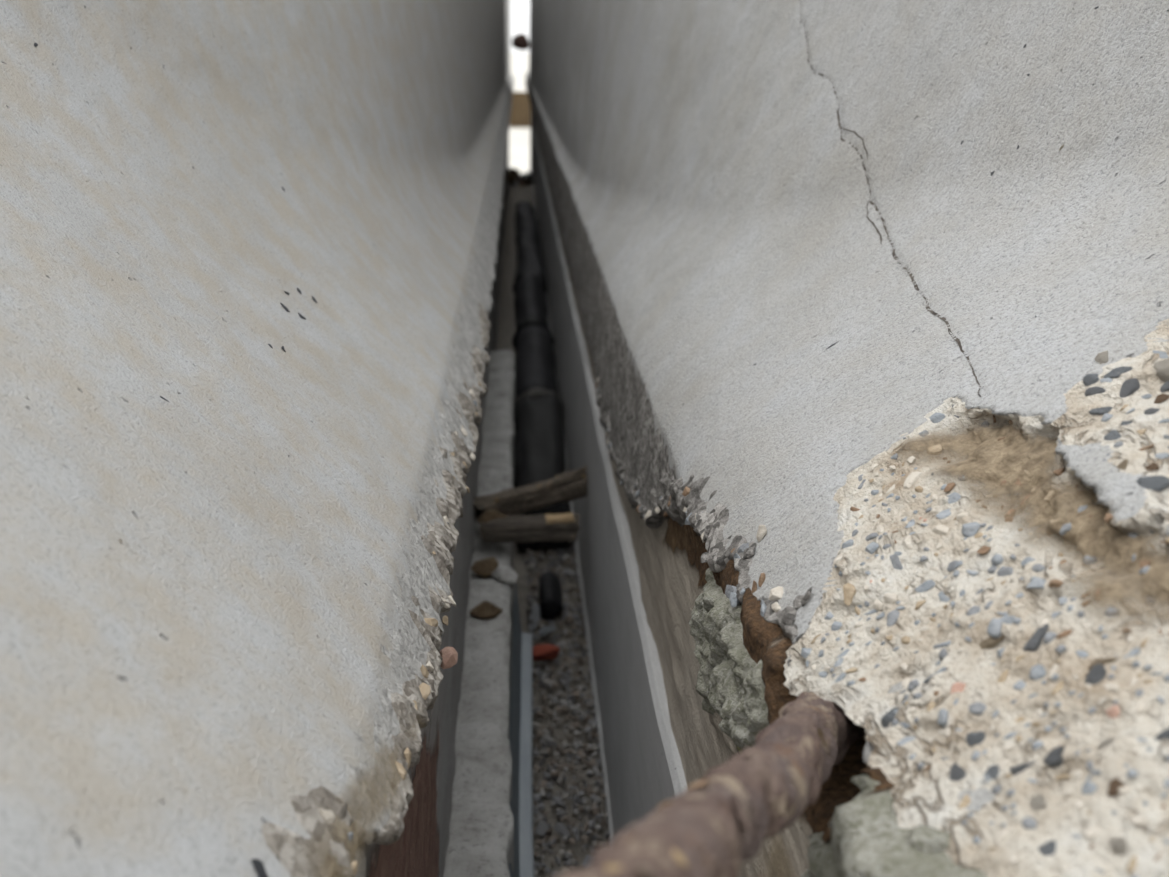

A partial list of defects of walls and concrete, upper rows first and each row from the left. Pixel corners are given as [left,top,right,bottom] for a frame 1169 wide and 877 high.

crack [800,2,982,397]
spalling [251,302,491,877]
rust [800,734,895,845]
spalling [556,319,1169,877]